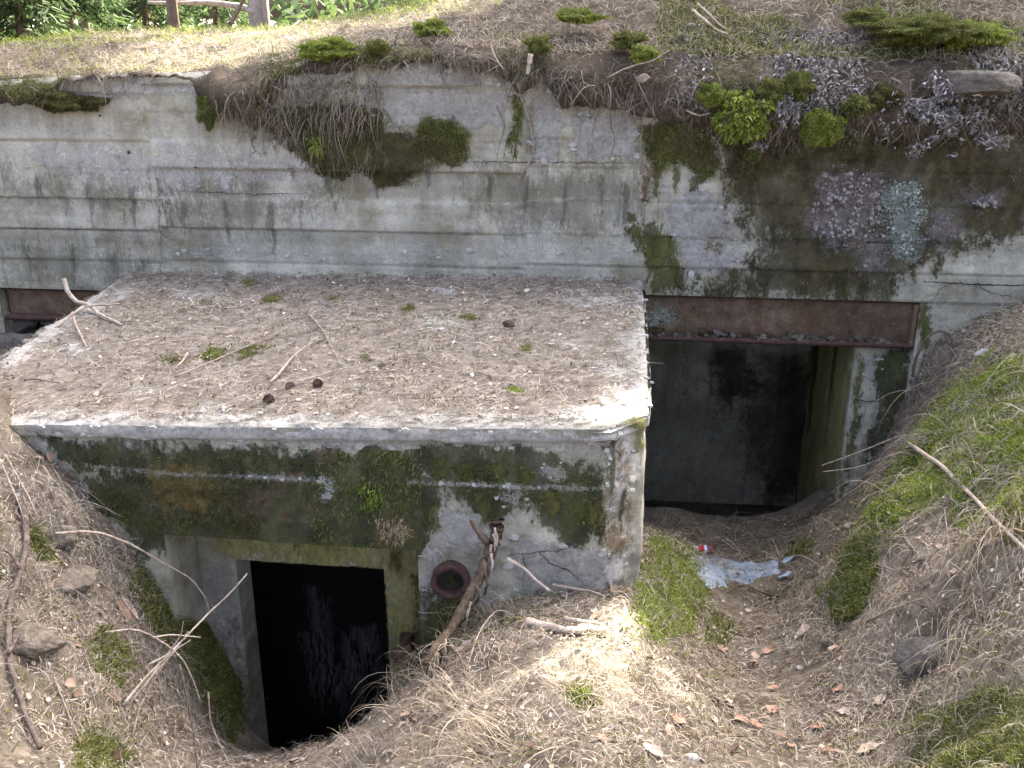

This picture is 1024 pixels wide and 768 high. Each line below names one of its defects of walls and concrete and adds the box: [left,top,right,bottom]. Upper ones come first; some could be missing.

leakage [26,136,320,194]
leakage [628,124,1024,302]
crack [923,281,1024,299]
leakage [644,346,818,506]
leakage [95,447,303,539]
leakage [316,475,336,499]
crack [507,526,592,580]